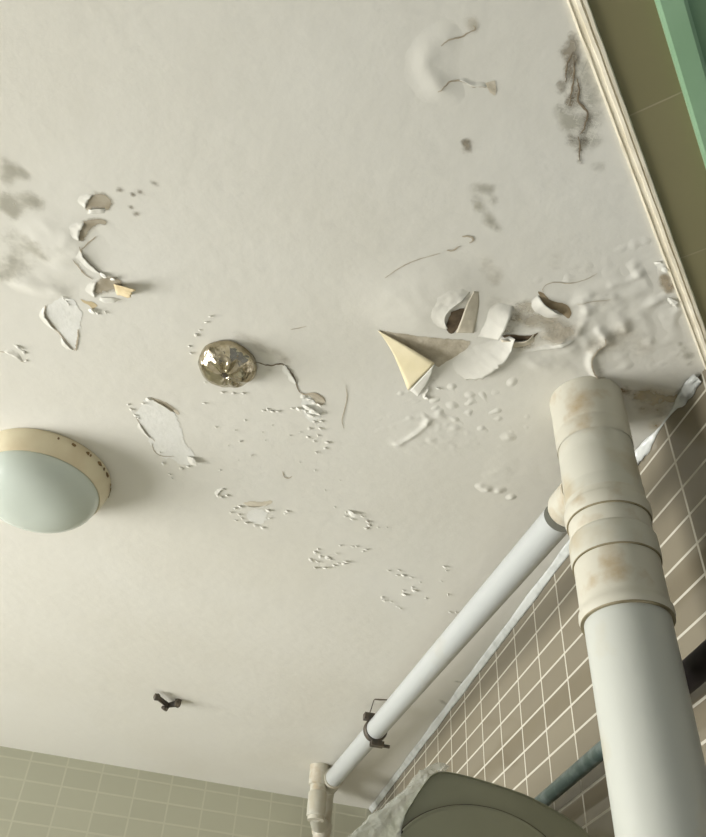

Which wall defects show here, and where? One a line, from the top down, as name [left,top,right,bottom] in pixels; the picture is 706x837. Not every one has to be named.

crack [441,25,476,46]
crack [438,78,497,95]
damp [561,38,590,160]
peeling [39,194,136,351]
crack [385,235,474,278]
peeling [378,273,607,400]
peeling [126,397,197,480]
crack [257,362,348,454]
peeling [229,500,273,529]